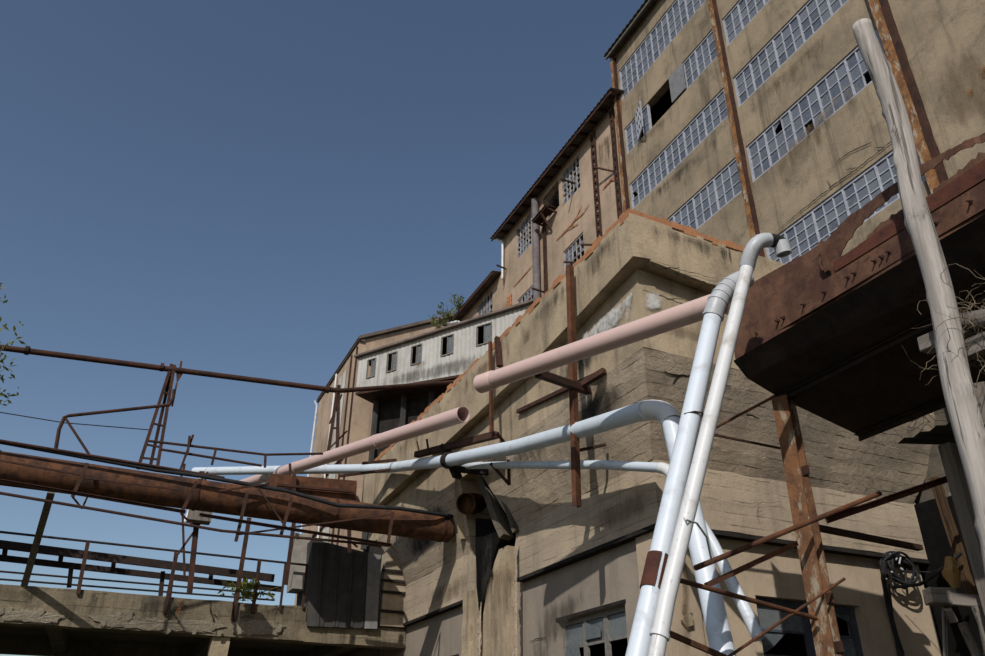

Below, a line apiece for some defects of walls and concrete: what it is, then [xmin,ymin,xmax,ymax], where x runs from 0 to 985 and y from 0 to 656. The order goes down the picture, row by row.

spalling [411,208,745,423]